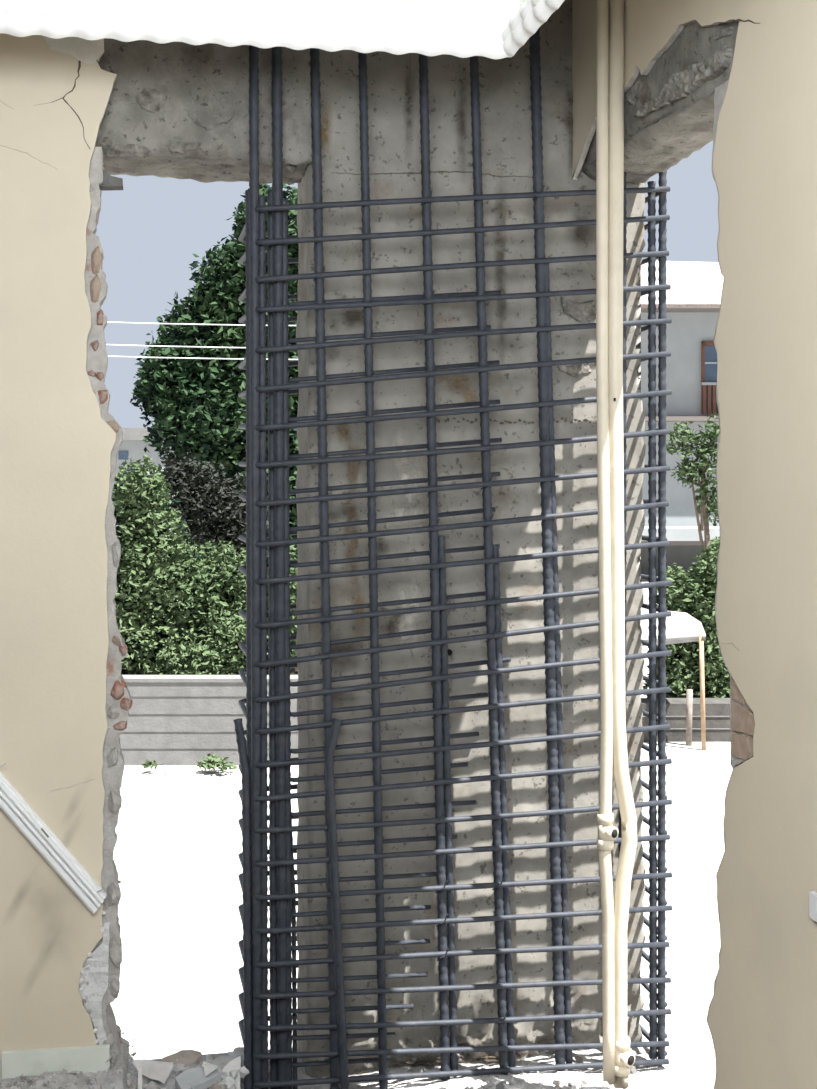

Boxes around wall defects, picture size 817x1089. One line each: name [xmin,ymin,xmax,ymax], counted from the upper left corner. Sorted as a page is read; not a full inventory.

spalling [627,27,733,118]
crack [0,60,101,149]
spalling [100,137,154,157]
flaking render [90,246,104,325]
flaking render [87,370,108,404]
spalling [558,364,592,377]
flaking render [112,540,121,567]
flaking render [107,681,133,730]
flaking render [108,791,122,813]
spalling [79,880,122,1066]